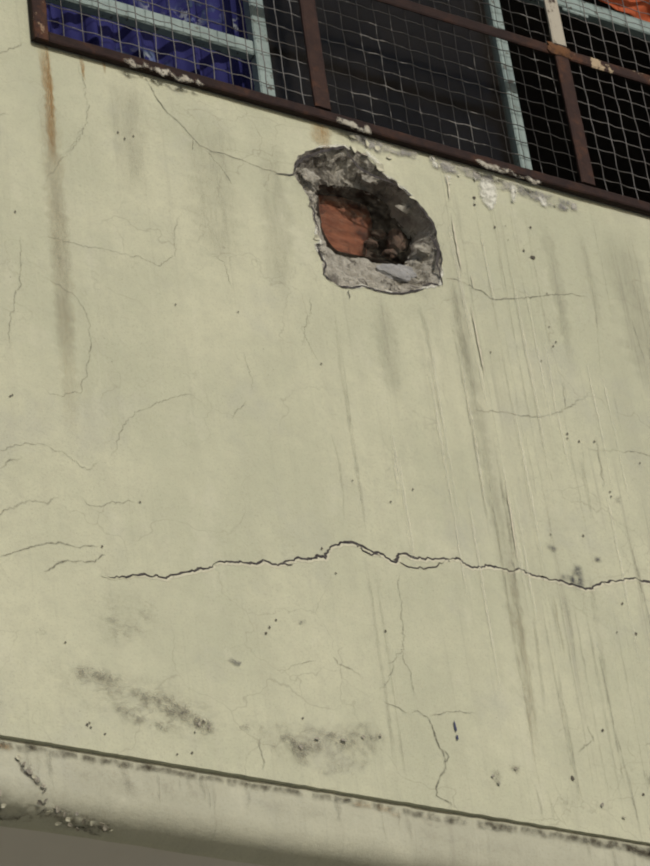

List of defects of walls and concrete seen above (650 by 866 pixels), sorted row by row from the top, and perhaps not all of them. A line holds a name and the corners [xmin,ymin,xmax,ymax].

corrosion [44,57,53,141]
spalling [277,117,443,296]
crack [100,541,650,592]
peeling [0,754,113,835]